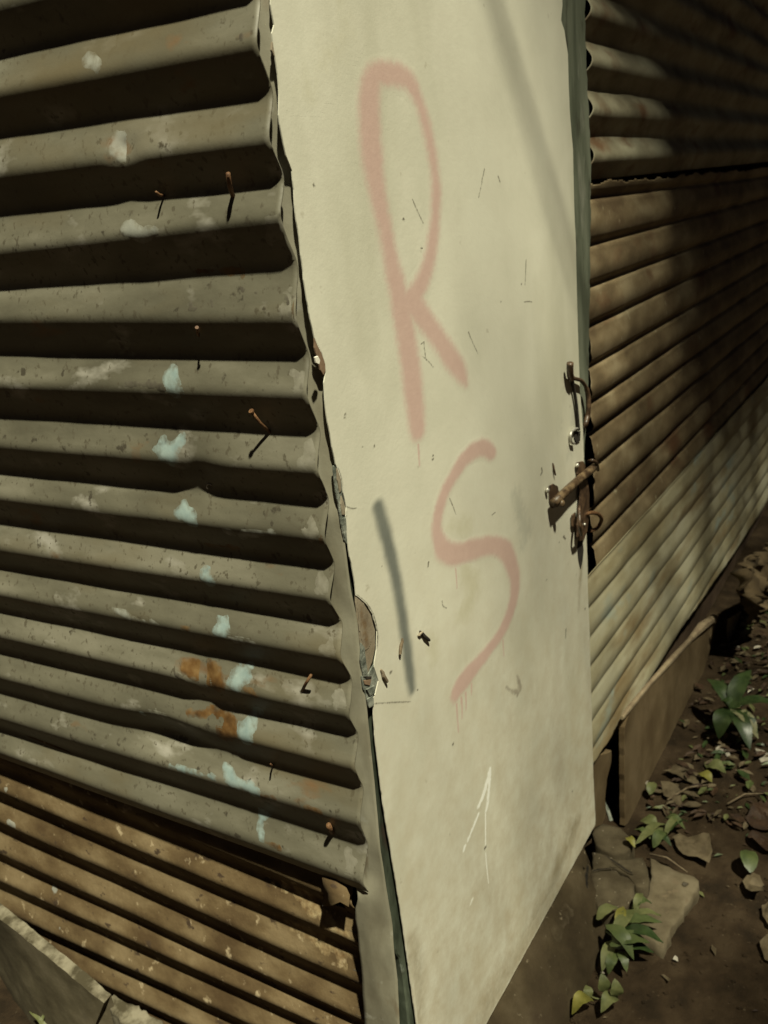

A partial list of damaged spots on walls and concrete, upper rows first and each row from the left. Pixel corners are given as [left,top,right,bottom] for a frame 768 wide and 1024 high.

rust [180,658,238,742]
peeling [355,593,393,708]